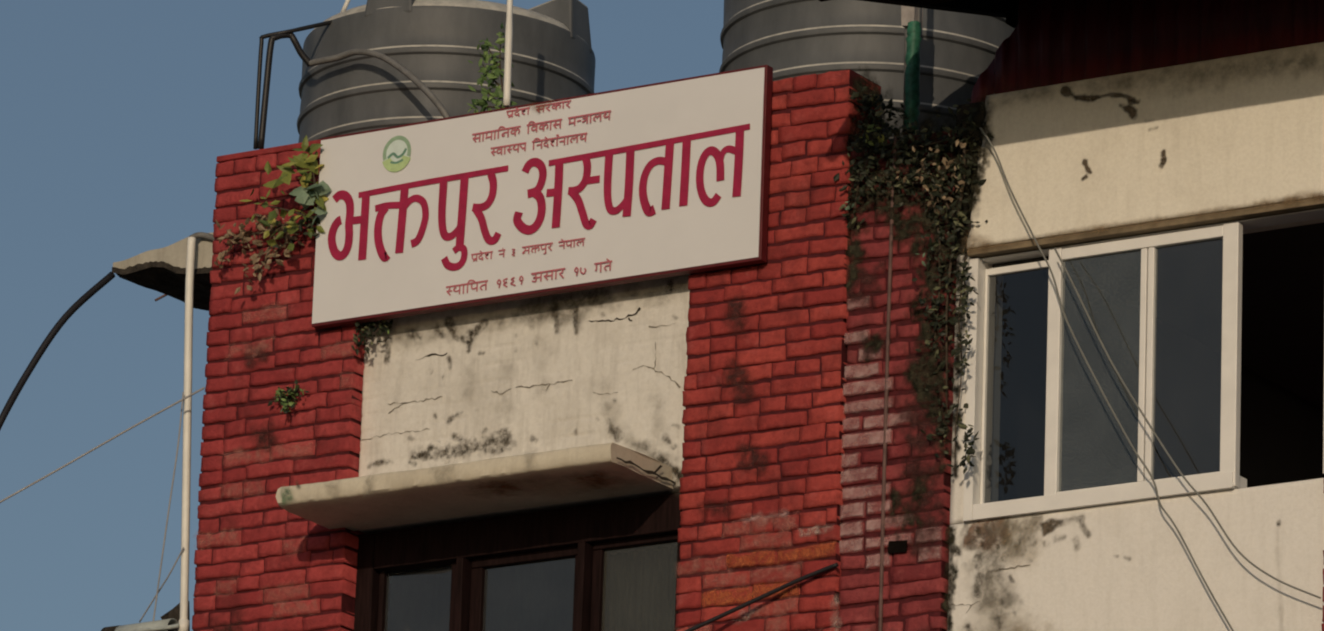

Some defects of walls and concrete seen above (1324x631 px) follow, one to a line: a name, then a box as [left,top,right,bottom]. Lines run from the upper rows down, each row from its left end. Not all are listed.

leakage [435,319,487,351]
crack [492,307,680,395]
leakage [412,418,511,459]